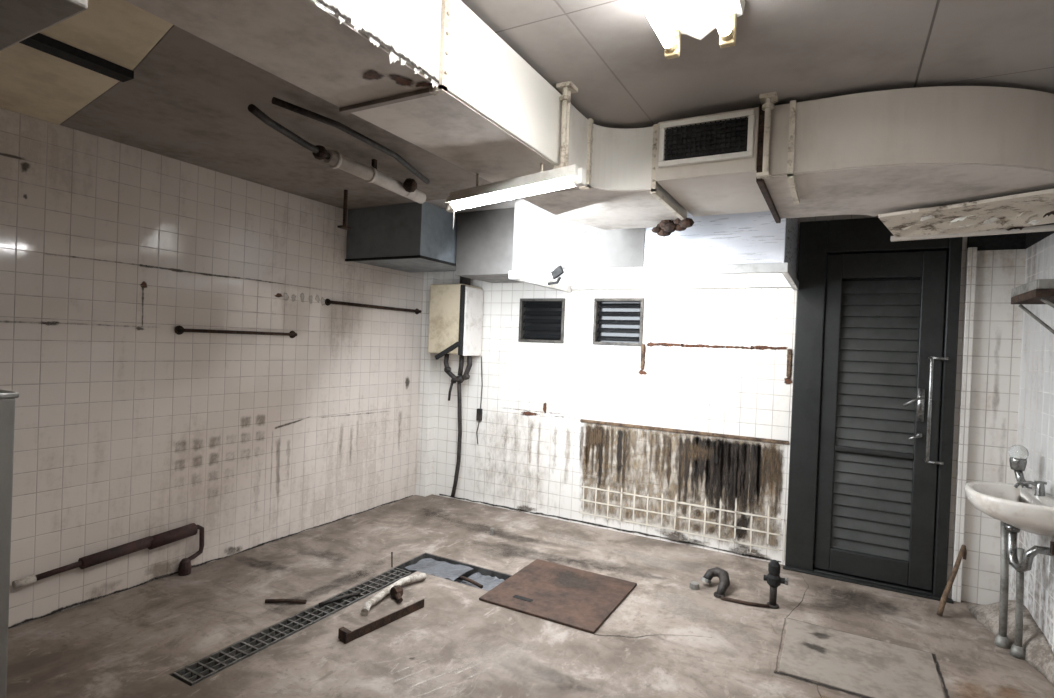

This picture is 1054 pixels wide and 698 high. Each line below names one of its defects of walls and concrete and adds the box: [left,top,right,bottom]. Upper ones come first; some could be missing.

peeling [312,0,439,88]
peeling [878,189,1054,242]
water stain [580,426,630,486]
water stain [645,435,782,517]